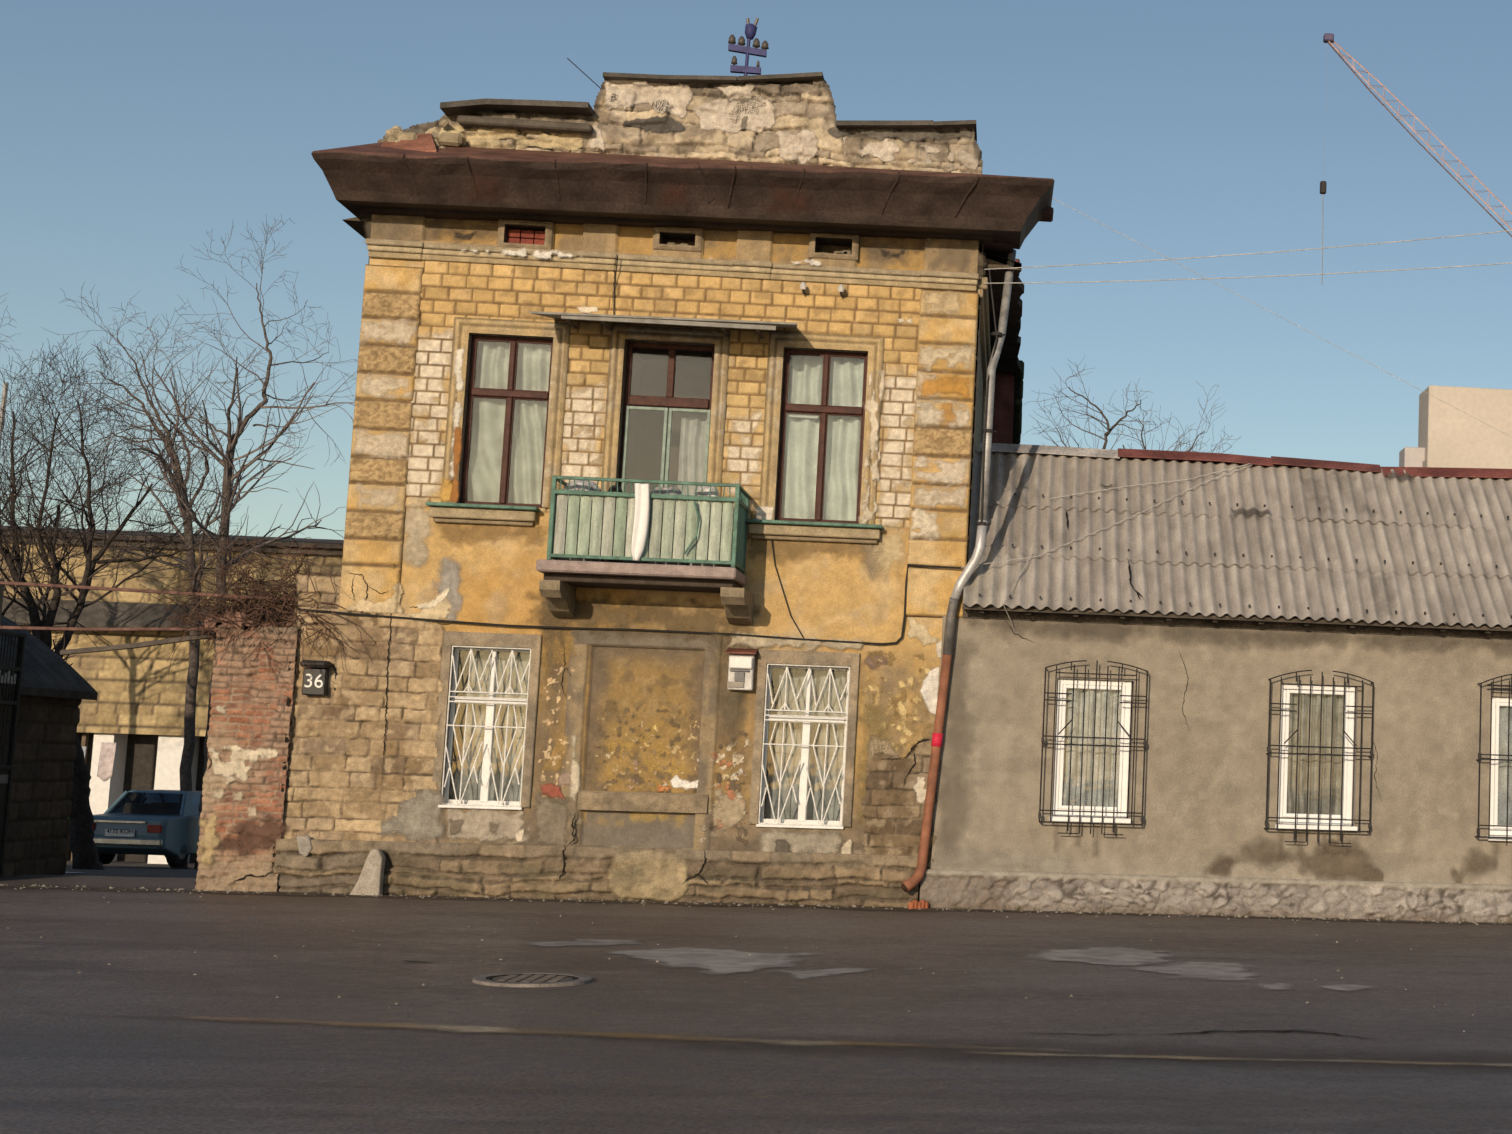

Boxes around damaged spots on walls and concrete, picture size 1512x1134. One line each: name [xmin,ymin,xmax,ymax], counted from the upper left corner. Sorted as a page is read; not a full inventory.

peeling [354,320,464,566]
flaking render [199,574,463,865]
flaking render [515,666,580,846]
flaking render [595,707,749,845]
flaking render [730,617,942,869]
damp [1209,843,1287,875]
damp [1305,841,1383,881]
damp [1457,854,1489,884]